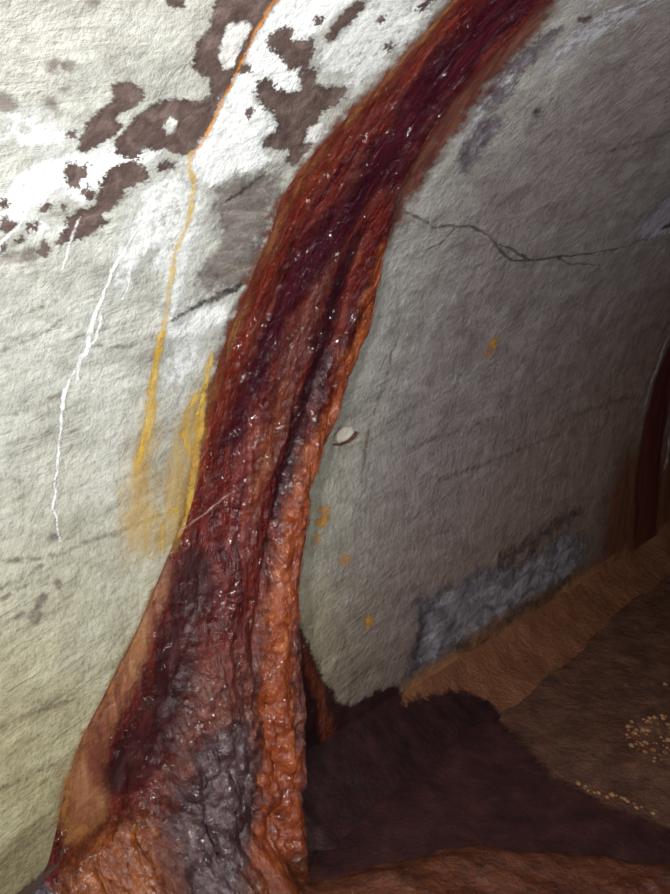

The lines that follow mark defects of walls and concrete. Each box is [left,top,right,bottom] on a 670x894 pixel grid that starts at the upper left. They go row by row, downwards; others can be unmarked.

water stain [0,108,162,236]
peeling [0,0,367,262]
water stain [114,0,433,391]
crack [404,211,653,266]
corrosion [43,0,555,894]
water stain [299,541,635,853]